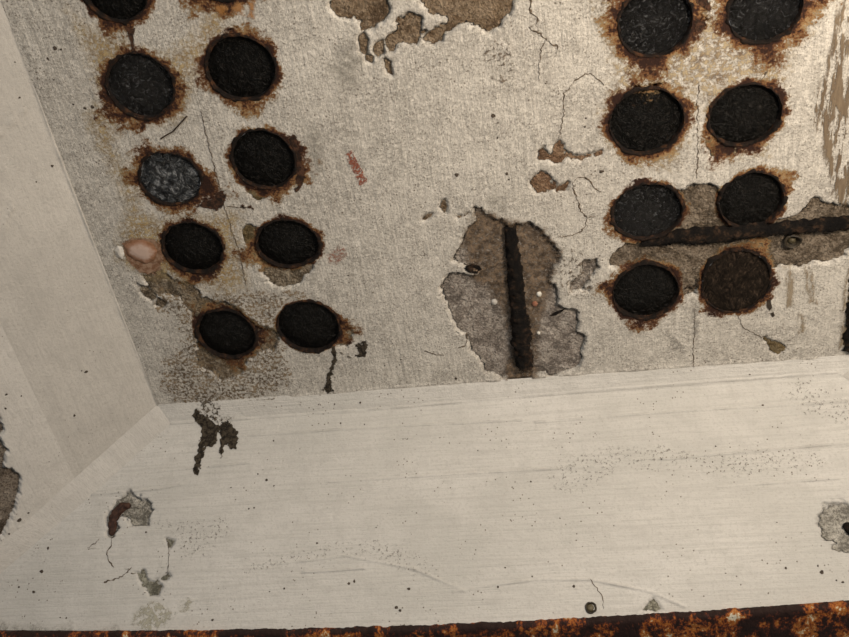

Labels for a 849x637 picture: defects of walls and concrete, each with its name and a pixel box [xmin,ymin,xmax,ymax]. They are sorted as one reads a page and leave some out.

spalling [330,0,513,75]
crack [529,0,558,79]
crack [559,73,604,135]
rust [594,0,843,244]
peeling [775,0,849,223]
rust [80,0,367,372]
crack [559,177,601,237]
rust [463,210,563,379]
spalling [440,208,600,379]
spalling [610,230,849,295]
damp [192,400,238,475]
spalling [819,503,849,552]